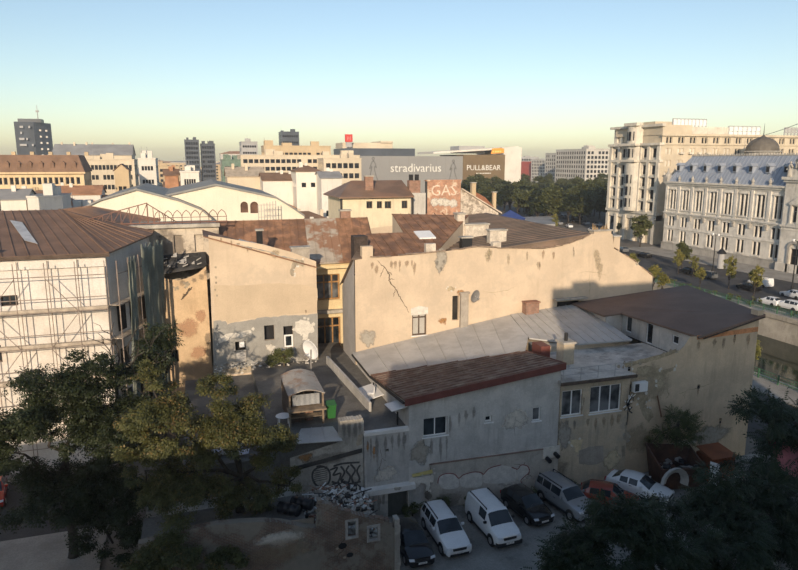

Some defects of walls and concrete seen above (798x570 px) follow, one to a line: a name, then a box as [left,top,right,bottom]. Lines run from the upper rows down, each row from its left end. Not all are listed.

crack [378,261,408,310]
spalling [216,327,255,346]
spalling [292,317,315,340]